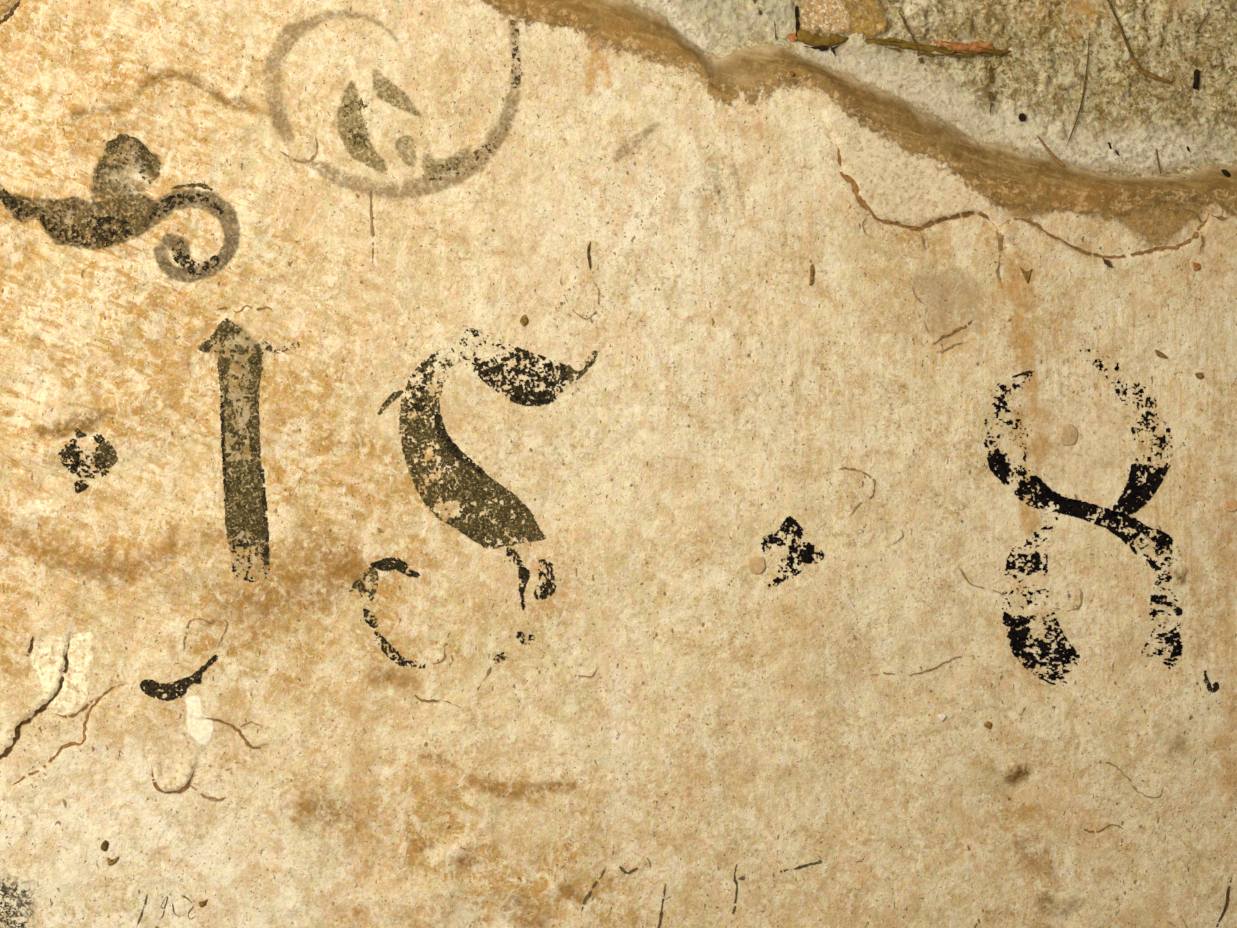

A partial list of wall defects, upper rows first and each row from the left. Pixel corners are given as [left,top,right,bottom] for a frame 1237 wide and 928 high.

spalling [632,0,1237,182]
flaking render [837,138,993,224]
crack [832,134,1228,287]
crack [0,638,124,786]